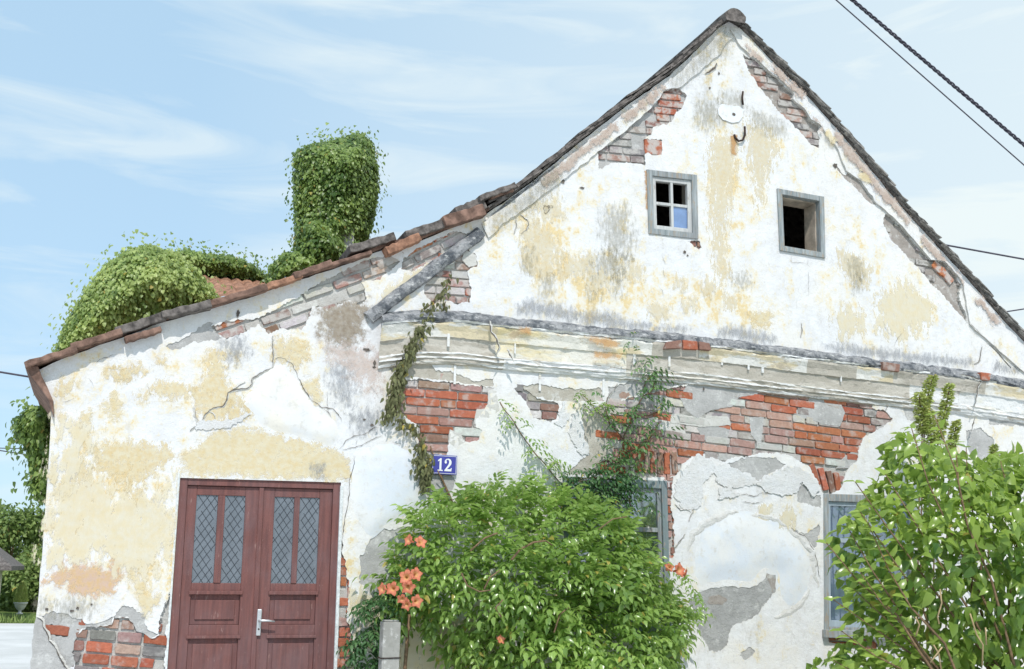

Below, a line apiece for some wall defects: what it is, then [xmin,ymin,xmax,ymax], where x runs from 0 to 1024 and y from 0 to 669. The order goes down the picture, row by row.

flaking render [598,89,685,169]
flaking render [743,43,837,148]
peeling [829,215,965,346]
leakage [316,301,385,392]
peeling [33,230,499,669]
crack [190,336,397,539]
flaking render [514,381,892,558]
flaking render [689,574,776,652]
flaking render [740,647,755,660]